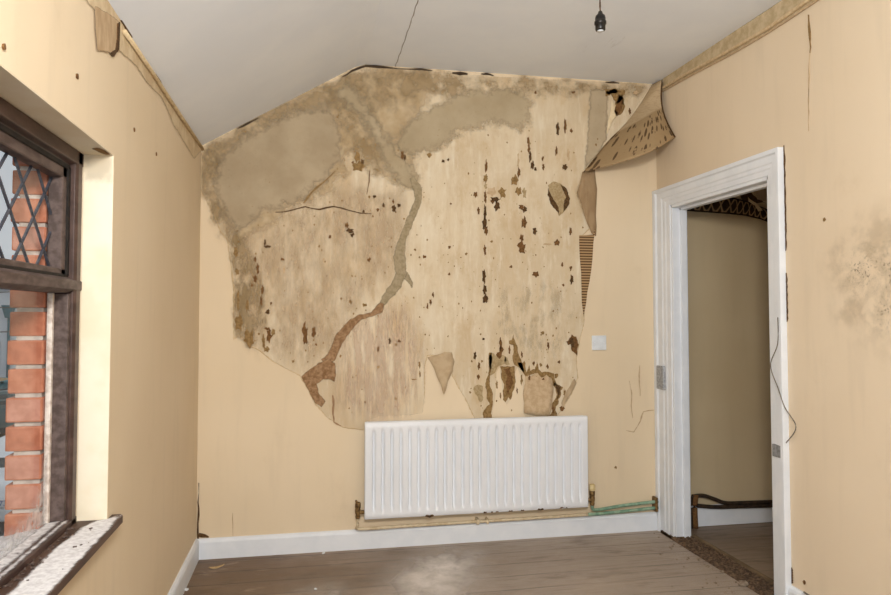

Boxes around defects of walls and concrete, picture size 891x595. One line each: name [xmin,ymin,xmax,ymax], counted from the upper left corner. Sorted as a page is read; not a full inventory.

flaking render [87,0,815,429]